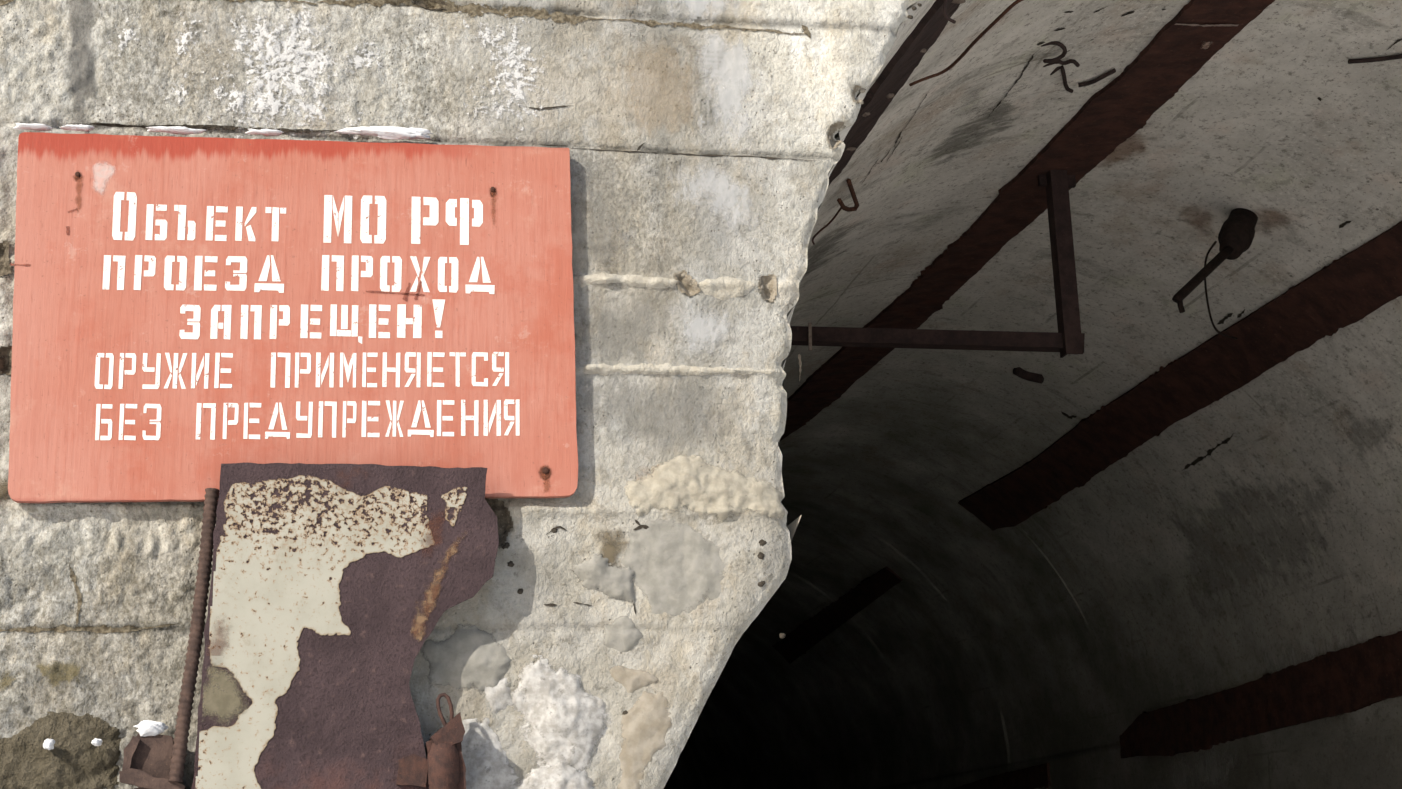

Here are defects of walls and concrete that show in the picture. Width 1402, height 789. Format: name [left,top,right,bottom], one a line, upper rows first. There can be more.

water stain [69,0,93,119]
efflorescence [107,9,150,57]
efflorescence [164,1,389,139]
corrosion [411,538,460,641]
peeling [572,554,658,693]